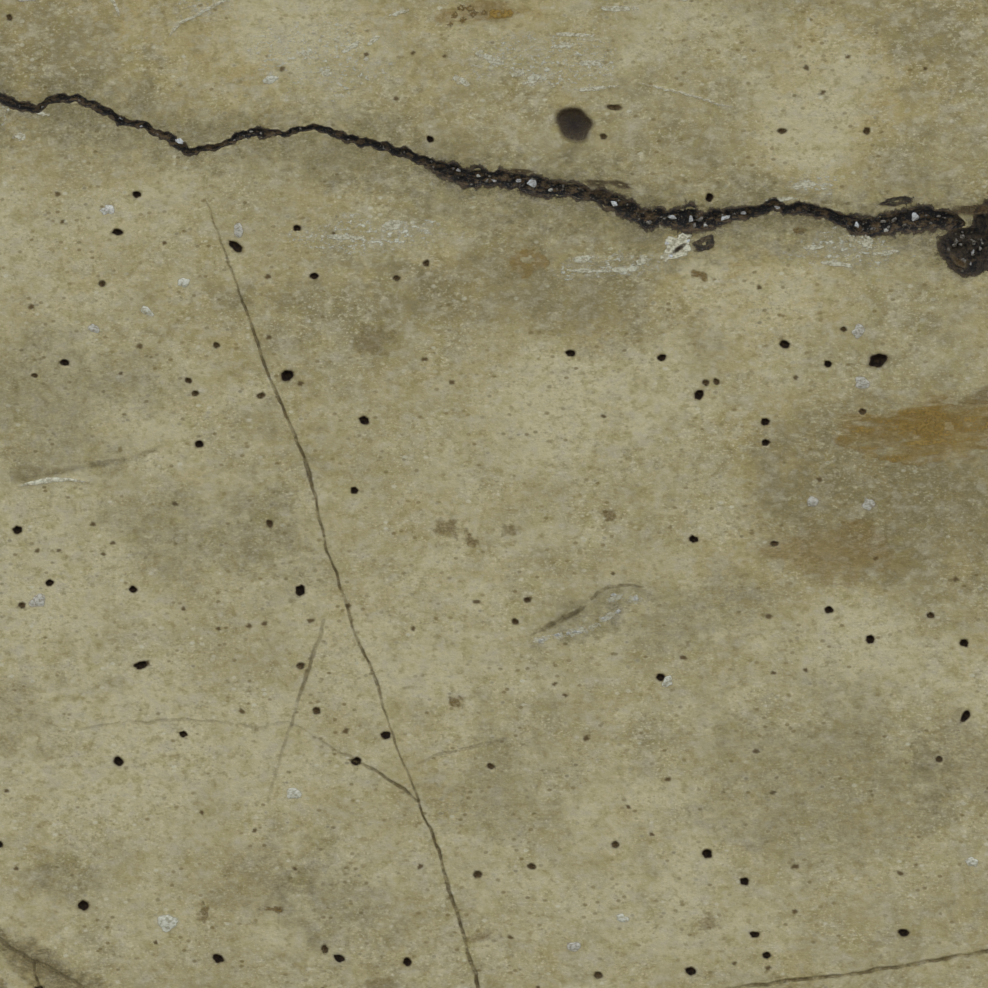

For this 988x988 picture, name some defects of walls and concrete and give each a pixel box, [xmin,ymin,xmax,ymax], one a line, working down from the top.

crack [0,92,965,252]
crack [241,301,379,692]
crack [379,772,479,988]
crack [754,955,956,986]